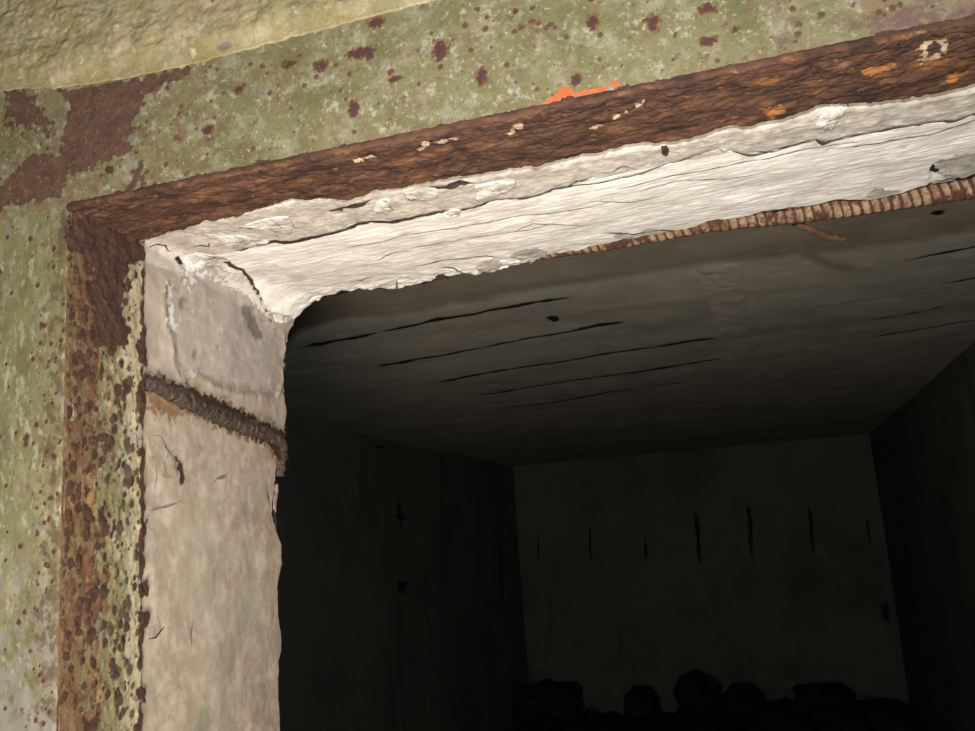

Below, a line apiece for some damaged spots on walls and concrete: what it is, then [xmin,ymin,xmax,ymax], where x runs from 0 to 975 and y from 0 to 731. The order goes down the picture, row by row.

corrosion [209,45,377,103]
corrosion [430,32,453,71]
corrosion [784,14,975,93]
peeling [815,103,848,131]
peeling [373,199,393,214]
peeling [474,180,516,202]
spalling [511,153,975,264]
crack [303,297,570,347]
crack [377,322,623,367]
crack [873,307,975,337]
corrosion [0,59,733,731]
crack [441,338,722,407]